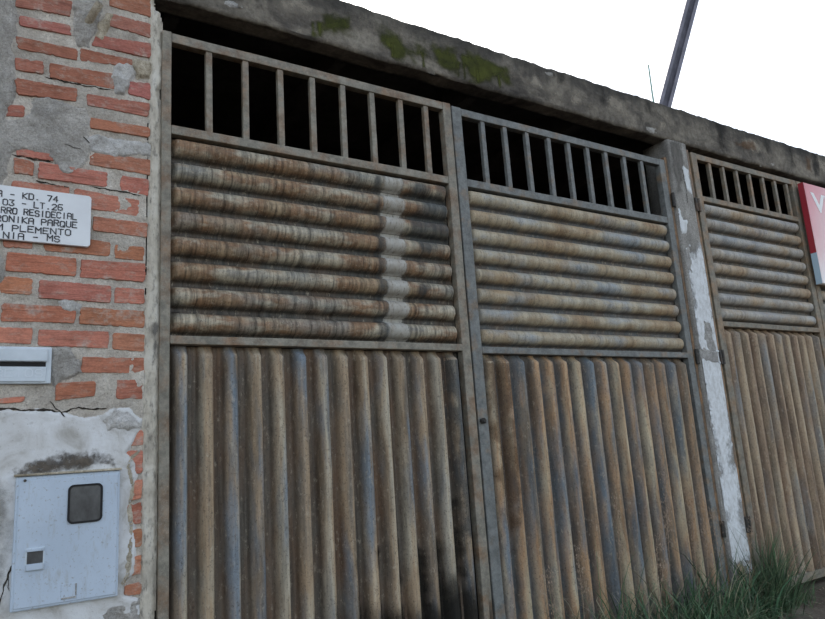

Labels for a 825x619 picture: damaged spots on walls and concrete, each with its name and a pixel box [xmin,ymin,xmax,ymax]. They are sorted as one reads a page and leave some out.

peeling [696,317,721,363]
crack [0,401,106,417]
flaking render [121,450,140,586]
crack [0,565,12,602]